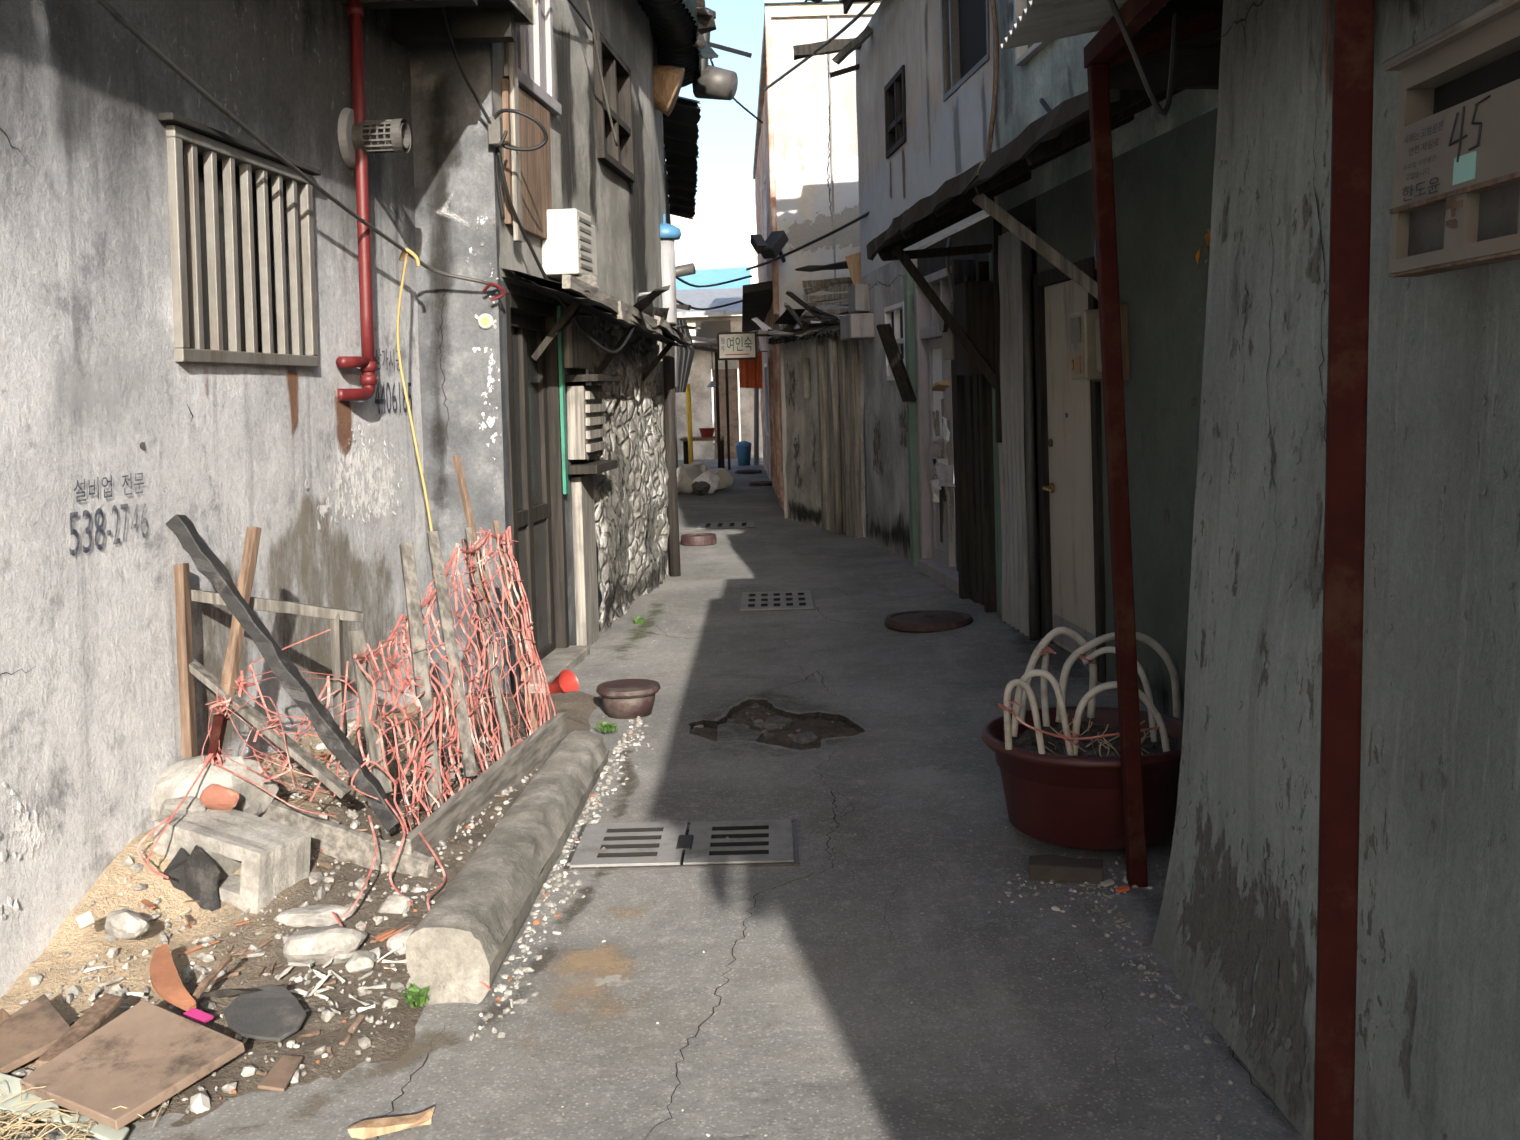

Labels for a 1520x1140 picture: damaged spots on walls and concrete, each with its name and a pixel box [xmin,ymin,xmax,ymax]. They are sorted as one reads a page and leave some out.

peeling [466,216,501,460]
peeling [774,40,858,174]
peeling [783,202,861,254]
peeling [1259,178,1327,388]
crack [644,752,862,1140]
peeling [1175,772,1317,1124]